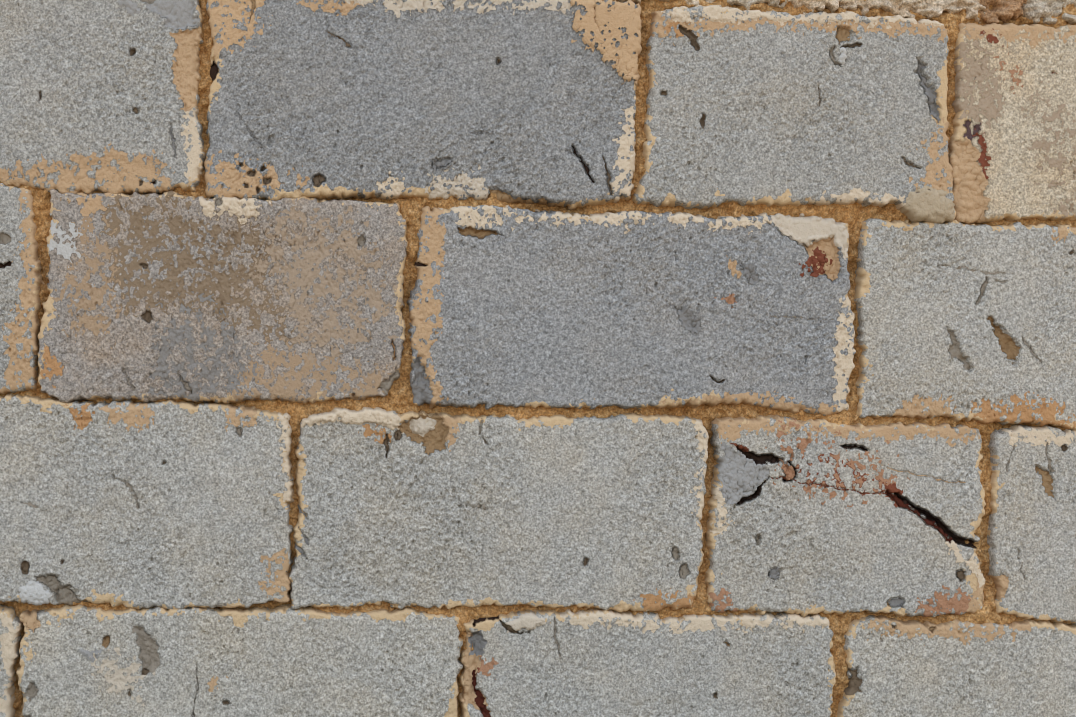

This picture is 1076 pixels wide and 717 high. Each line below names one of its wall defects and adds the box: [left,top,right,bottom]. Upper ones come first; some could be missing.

rust [963,120,991,179]
rust [799,246,833,277]
crack [737,445,977,548]